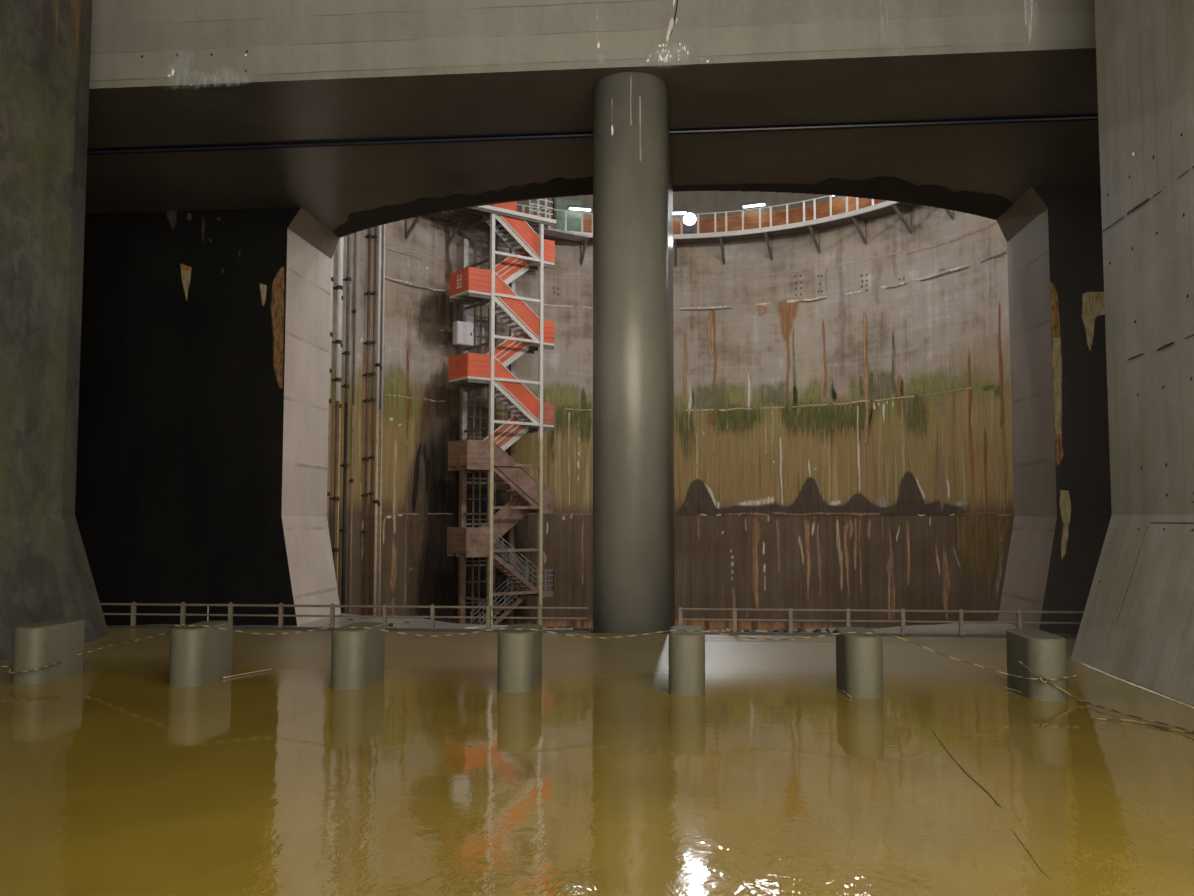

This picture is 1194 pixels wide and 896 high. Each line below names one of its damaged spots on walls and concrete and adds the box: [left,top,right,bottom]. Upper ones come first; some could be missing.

crack [666,0,678,42]
crack [1103,166,1194,232]
leakage [419,231,461,347]
rust [707,310,717,383]
rust [759,301,798,402]
crack [1127,334,1194,361]
leakage [383,367,547,621]
leakage [562,411,584,585]